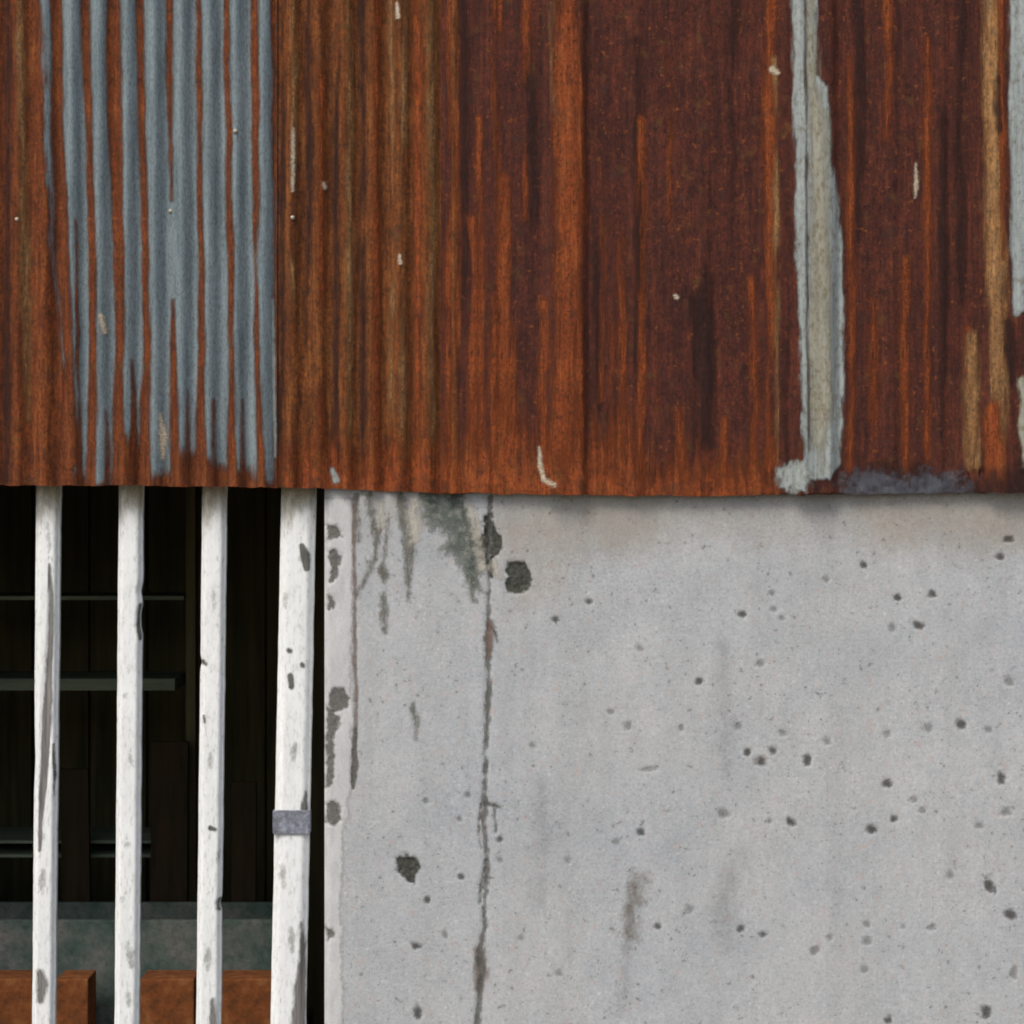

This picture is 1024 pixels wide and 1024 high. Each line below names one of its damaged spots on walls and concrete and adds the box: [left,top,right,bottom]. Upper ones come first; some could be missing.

rust [0,0,788,515]
rust [846,0,1024,495]
damp [352,492,387,595]
damp [380,593,388,633]
damp [396,492,501,602]
spalling [505,561,533,593]
crack [473,496,501,1024]
spalling [396,854,421,882]